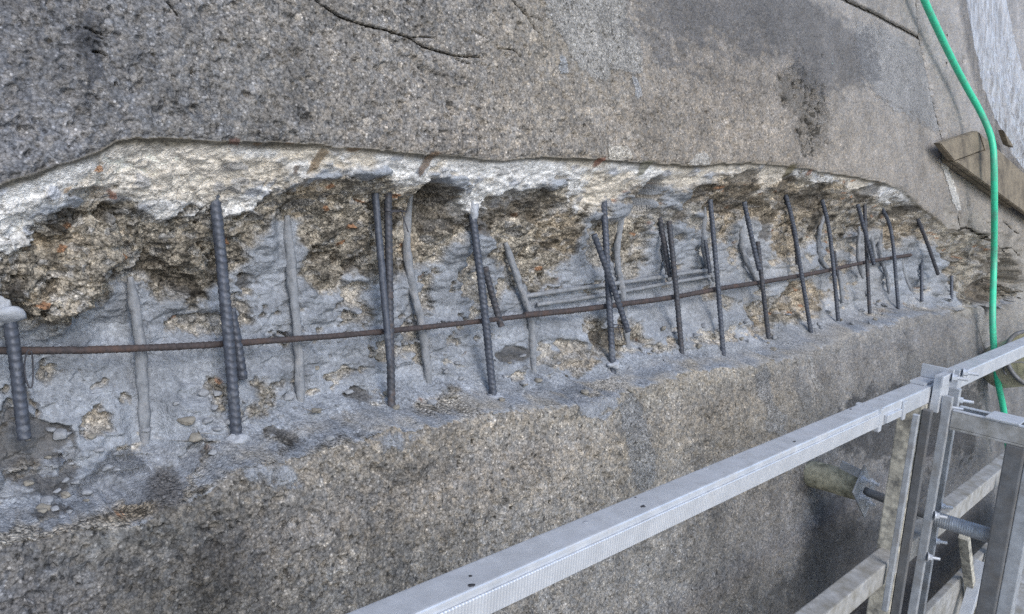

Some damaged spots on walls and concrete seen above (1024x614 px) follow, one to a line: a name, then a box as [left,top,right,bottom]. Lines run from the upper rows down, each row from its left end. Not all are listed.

crack [314,0,520,64]
spalling [0,137,1023,545]